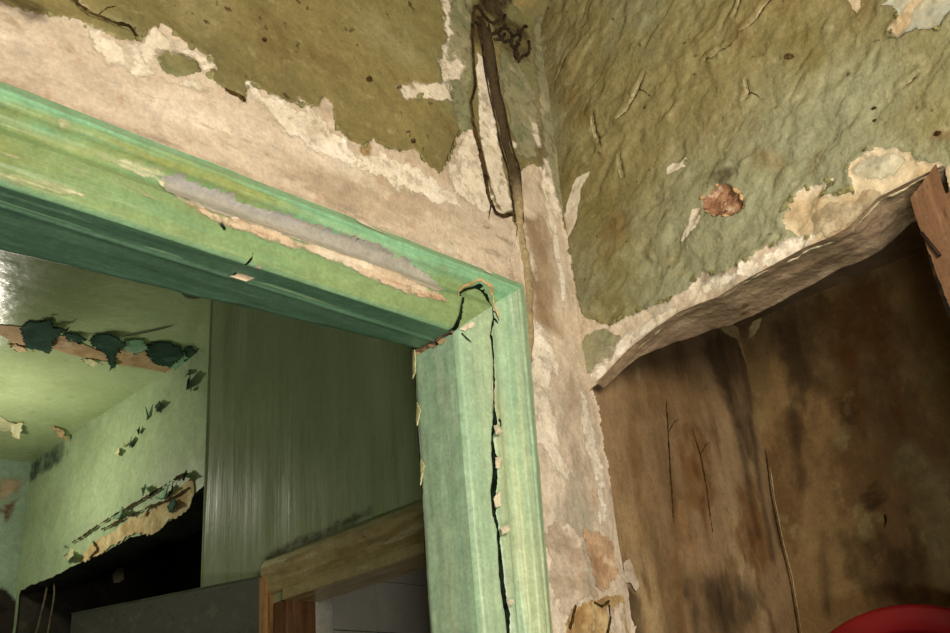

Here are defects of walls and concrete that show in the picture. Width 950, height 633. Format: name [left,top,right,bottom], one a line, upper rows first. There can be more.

crack [72,0,139,41]
peeling [881,0,950,38]
peeling [0,0,526,301]
peeling [0,318,197,392]
peeling [499,16,950,633]
peeling [0,417,26,439]
peeling [115,401,161,457]
crack [410,278,514,633]
peeling [64,470,194,562]